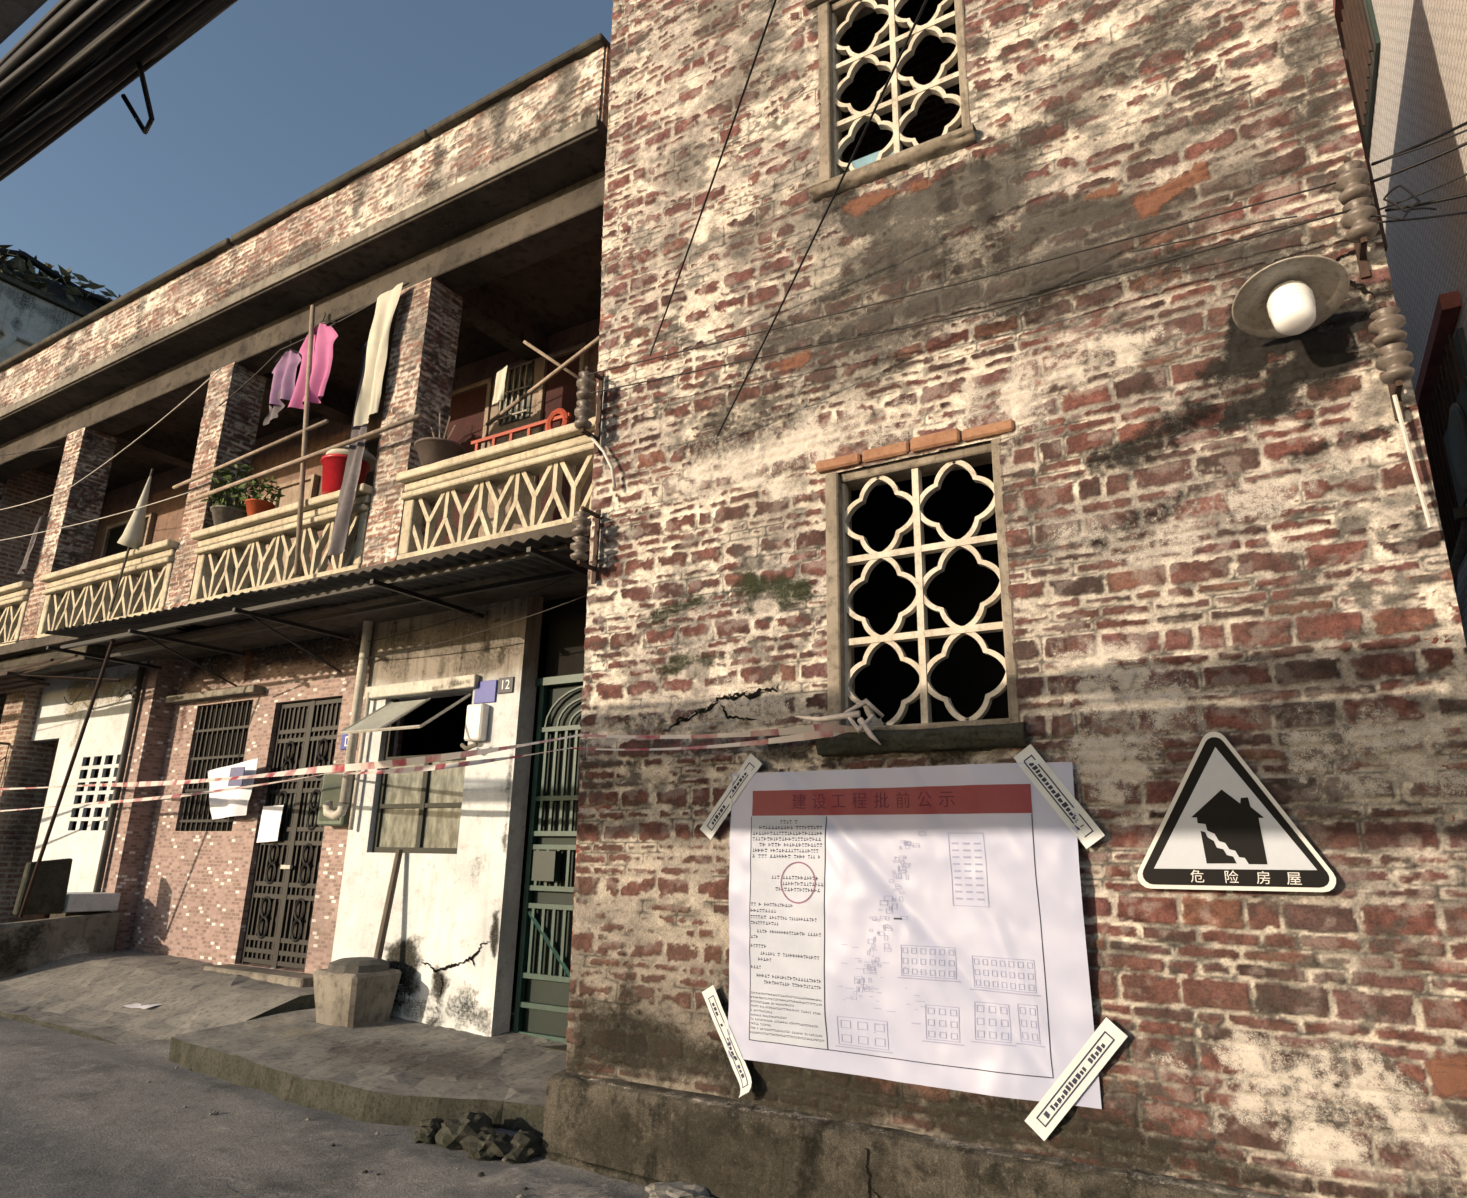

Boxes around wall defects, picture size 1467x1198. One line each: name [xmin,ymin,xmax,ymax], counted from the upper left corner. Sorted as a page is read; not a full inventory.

crack [663,683,779,731]
damp [385,938,490,1033]
crack [421,941,491,995]